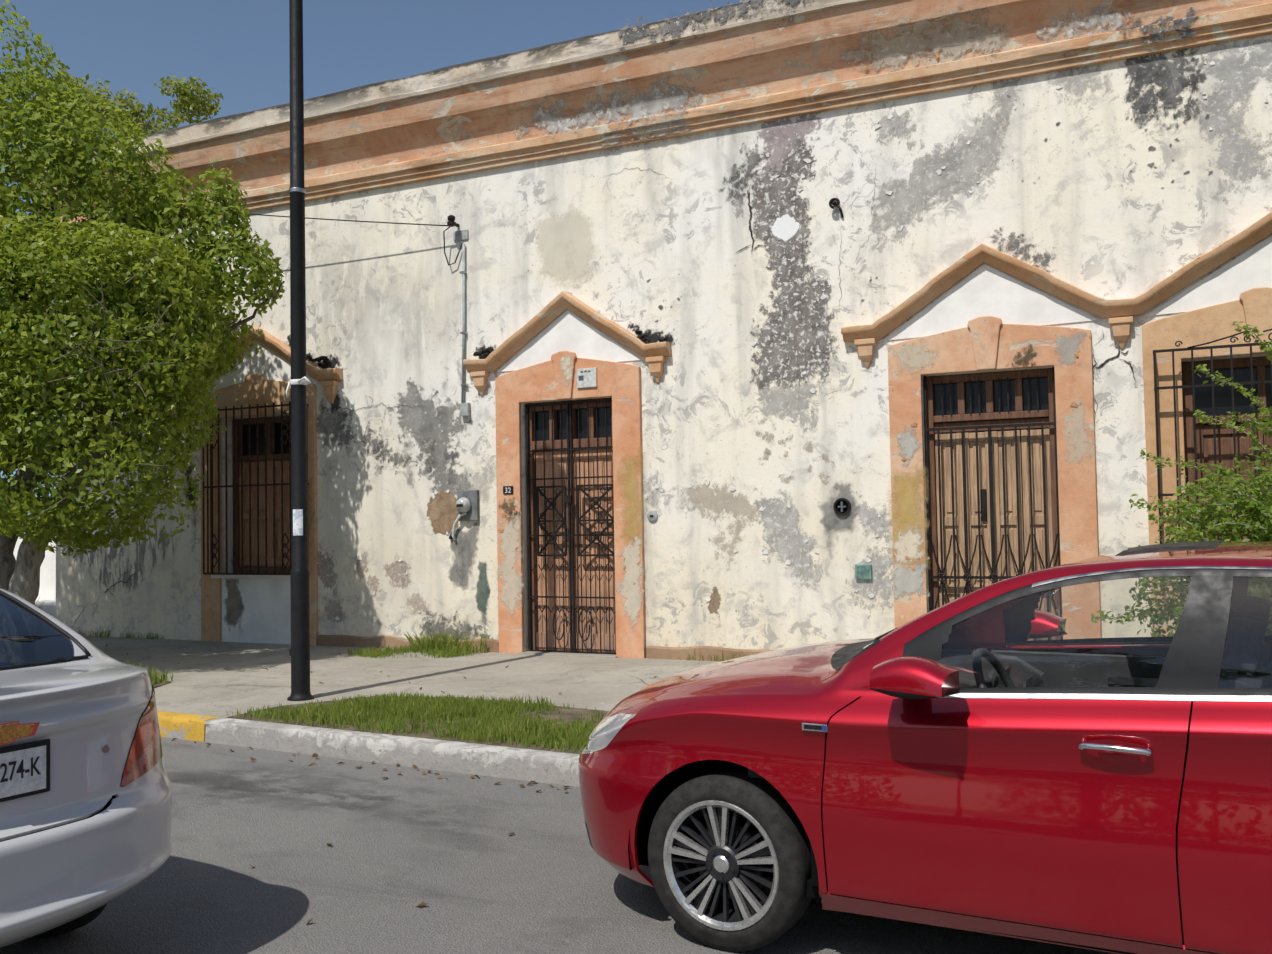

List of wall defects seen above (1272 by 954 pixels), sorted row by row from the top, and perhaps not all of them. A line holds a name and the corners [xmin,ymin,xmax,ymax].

spalling [840,4,1018,75]
peeling [865,77,1024,241]
spalling [1037,5,1131,43]
peeling [1191,39,1272,203]
spalling [746,112,838,484]
crack [1092,329,1136,416]
peeling [681,474,823,588]
peeling [846,423,930,618]